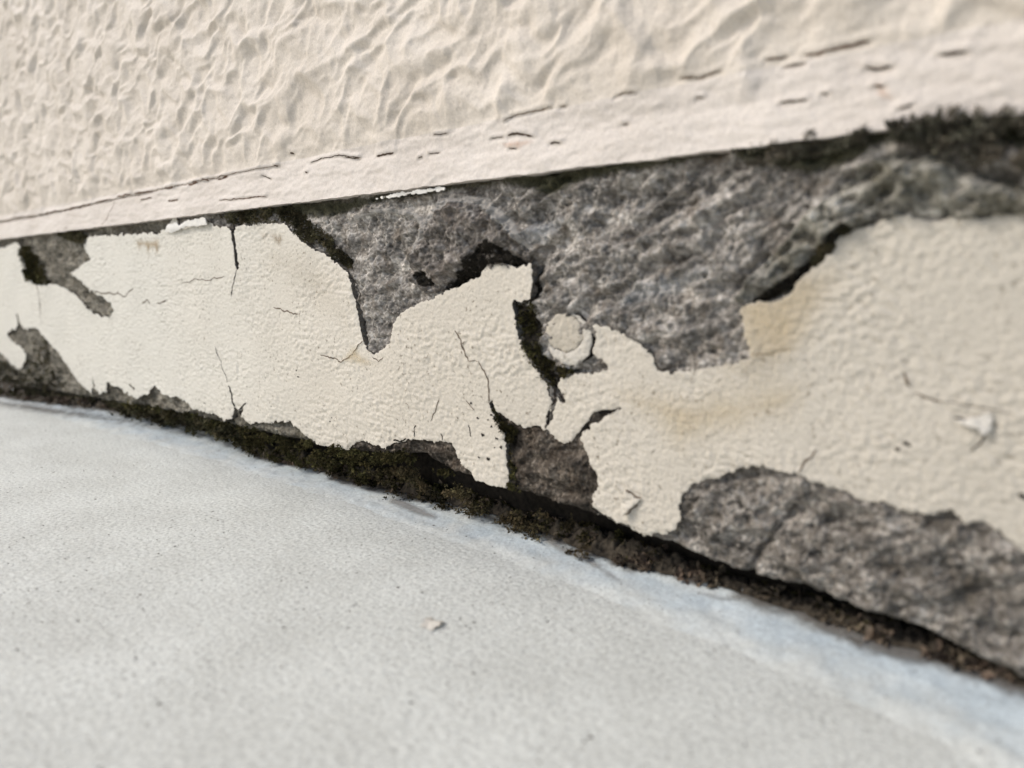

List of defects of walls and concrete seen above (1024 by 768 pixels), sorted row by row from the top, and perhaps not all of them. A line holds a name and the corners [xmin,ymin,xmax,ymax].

crack [1,152,393,304]
crack [215,348,246,415]
crack [393,400,443,442]
crack [454,330,490,436]
peeling [0,140,1024,527]
peeling [648,465,1024,677]